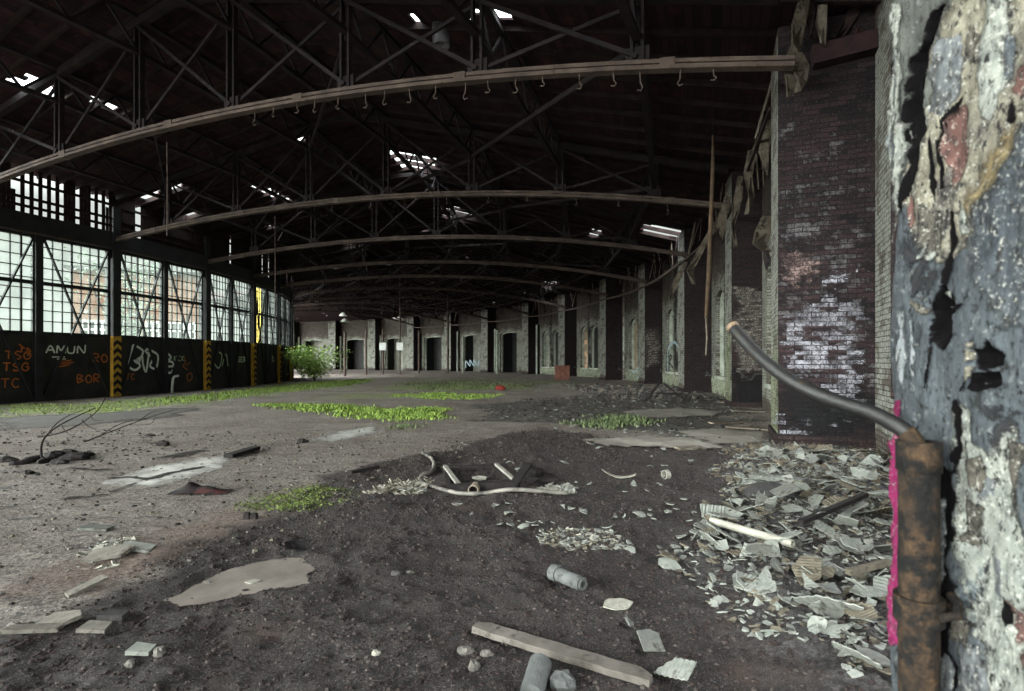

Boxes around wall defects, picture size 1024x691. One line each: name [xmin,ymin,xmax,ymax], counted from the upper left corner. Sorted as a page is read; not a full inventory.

flaking render [901,0,1024,388]